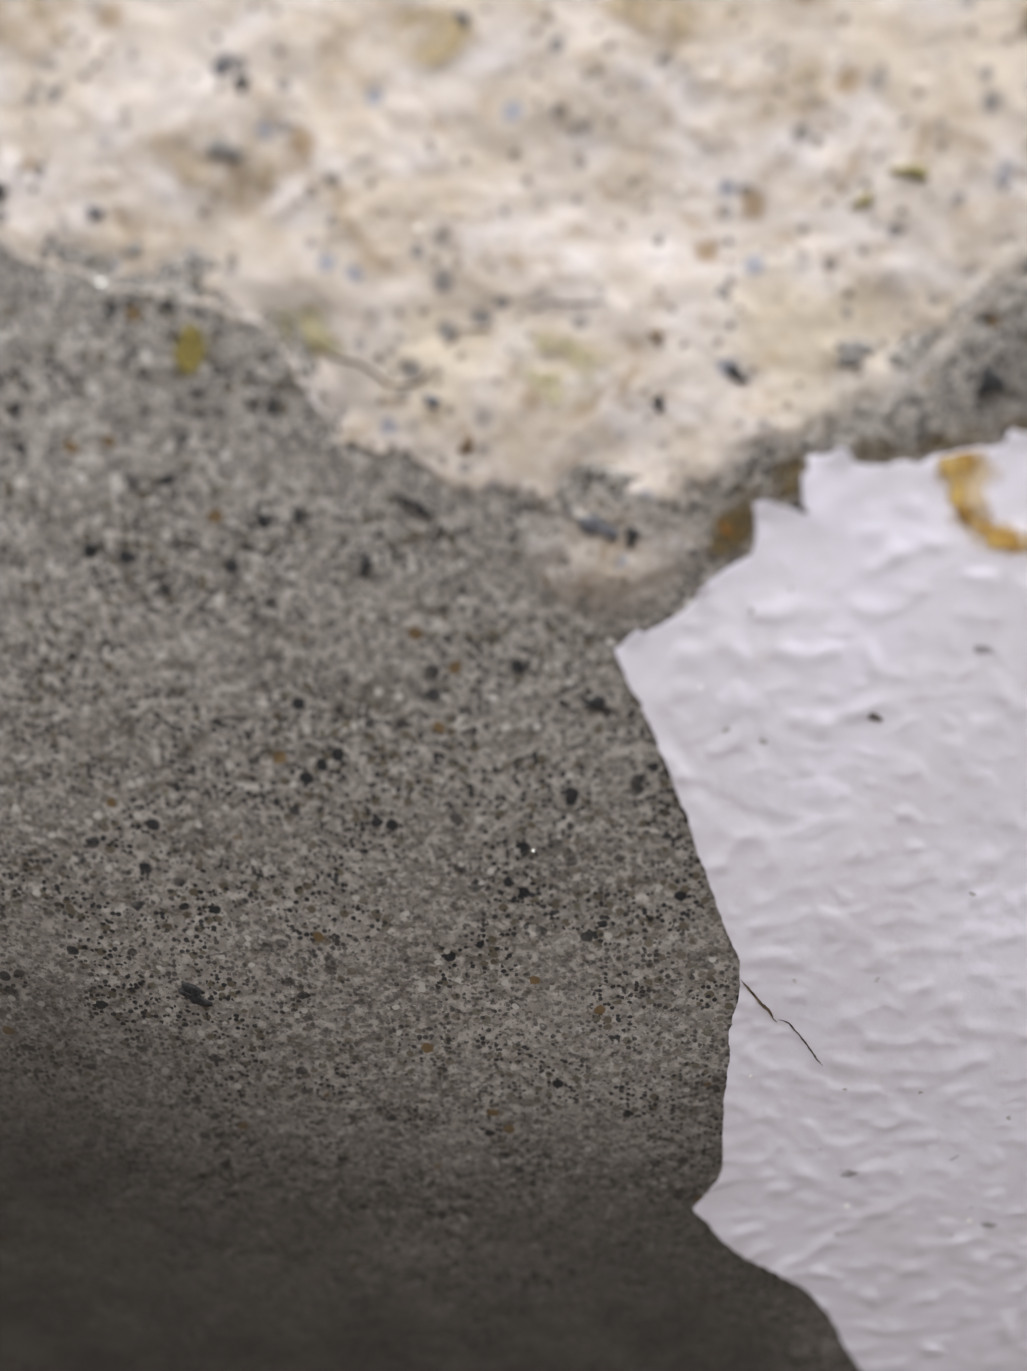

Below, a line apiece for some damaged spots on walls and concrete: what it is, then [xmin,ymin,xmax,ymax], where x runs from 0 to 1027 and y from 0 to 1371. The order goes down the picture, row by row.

peeling [615,430,1027,1371]